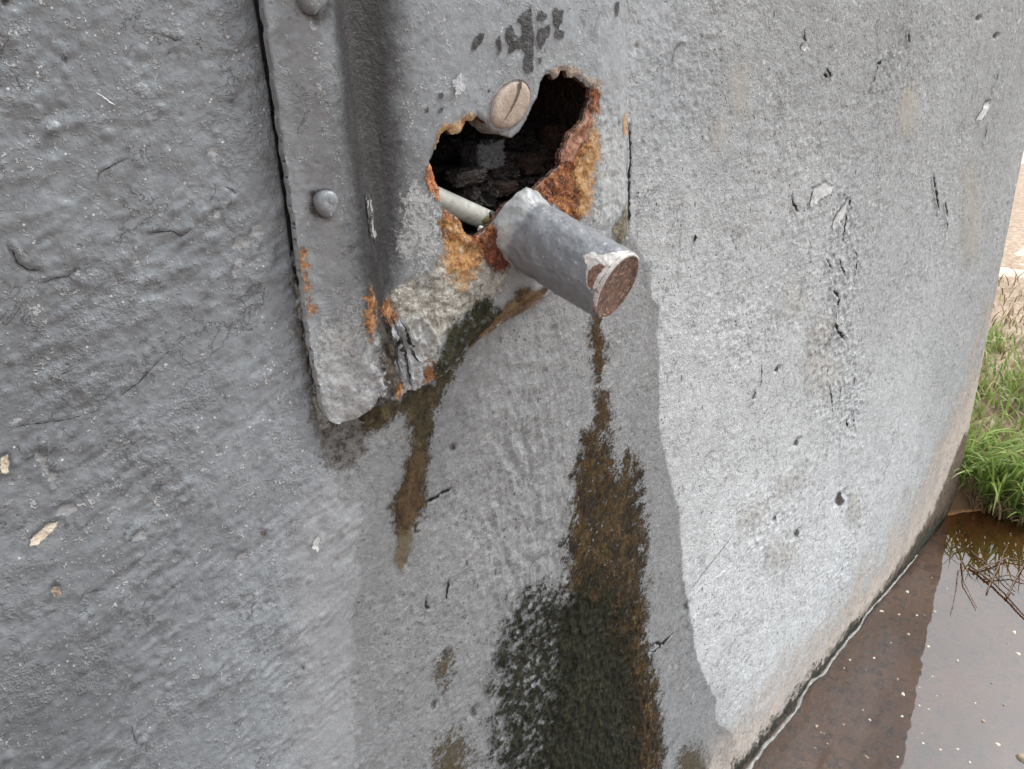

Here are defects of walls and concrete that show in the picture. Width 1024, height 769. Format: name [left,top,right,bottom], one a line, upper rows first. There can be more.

peeling [426,72,467,113]
rust [435,112,473,148]
rust [533,64,603,221]
rust [424,162,511,293]
crack [933,177,948,228]
rust [299,246,319,318]
rust [360,284,400,344]
crack [385,313,420,387]
rust [466,285,549,353]
leakage [583,315,615,443]
crack [826,200,858,341]
leakage [529,562,655,769]